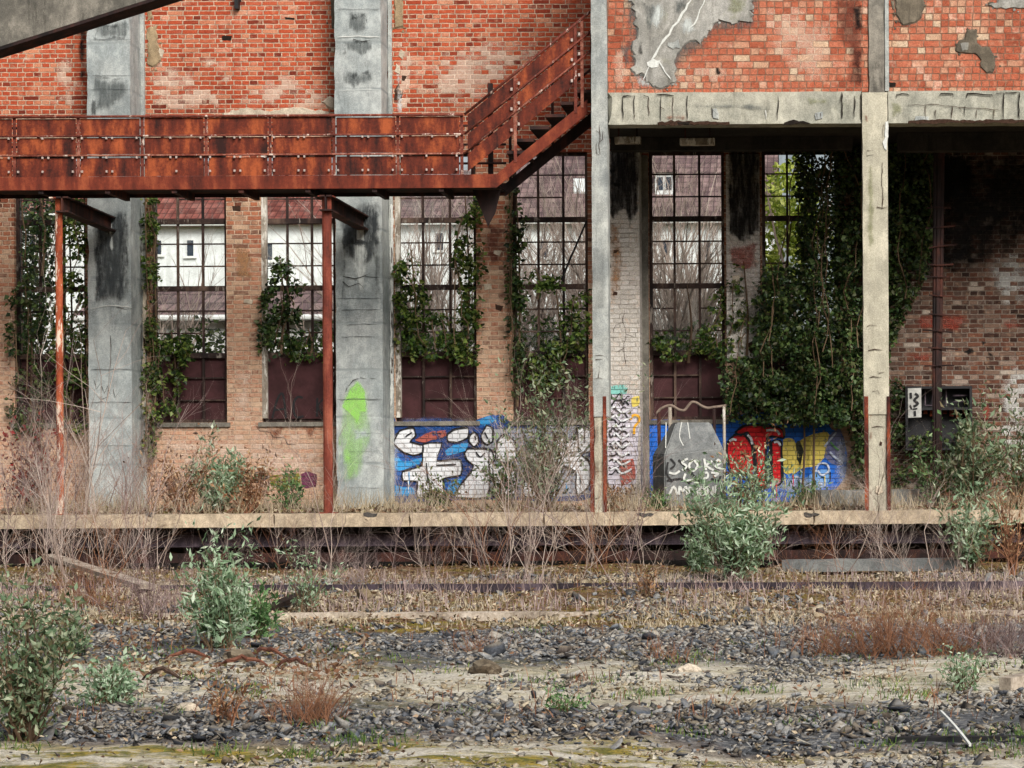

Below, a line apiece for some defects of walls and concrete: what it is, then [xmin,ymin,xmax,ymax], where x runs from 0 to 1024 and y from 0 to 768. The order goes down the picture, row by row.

leakage [347,14,371,54]
peeling [628,0,754,91]
peeling [891,0,926,30]
peeling [955,27,1001,73]
leakage [56,32,124,114]
spalling [657,107,730,126]
spalling [784,112,823,125]
spalling [908,116,1024,124]
leakage [95,213,128,300]